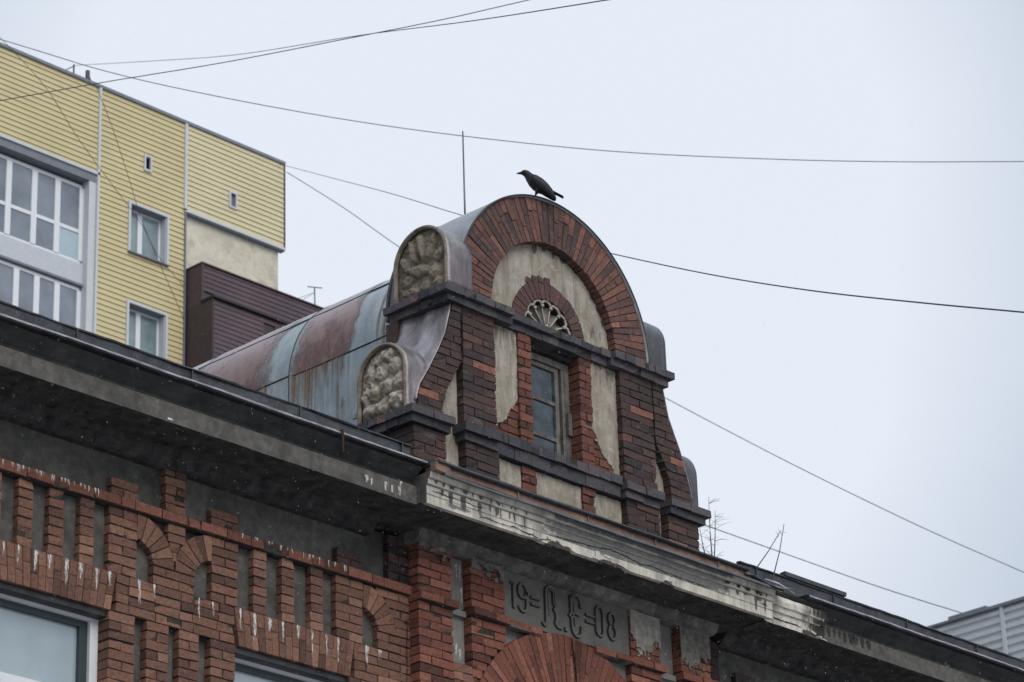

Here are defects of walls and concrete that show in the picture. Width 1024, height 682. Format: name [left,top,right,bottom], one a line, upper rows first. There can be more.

rust [200,280,388,419]
spalling [495,401,519,438]
spalling [593,432,614,473]
spalling [545,537,570,553]
crack [431,490,705,587]
spalling [593,556,622,571]
flaking render [629,609,661,660]
flaking render [679,626,711,676]